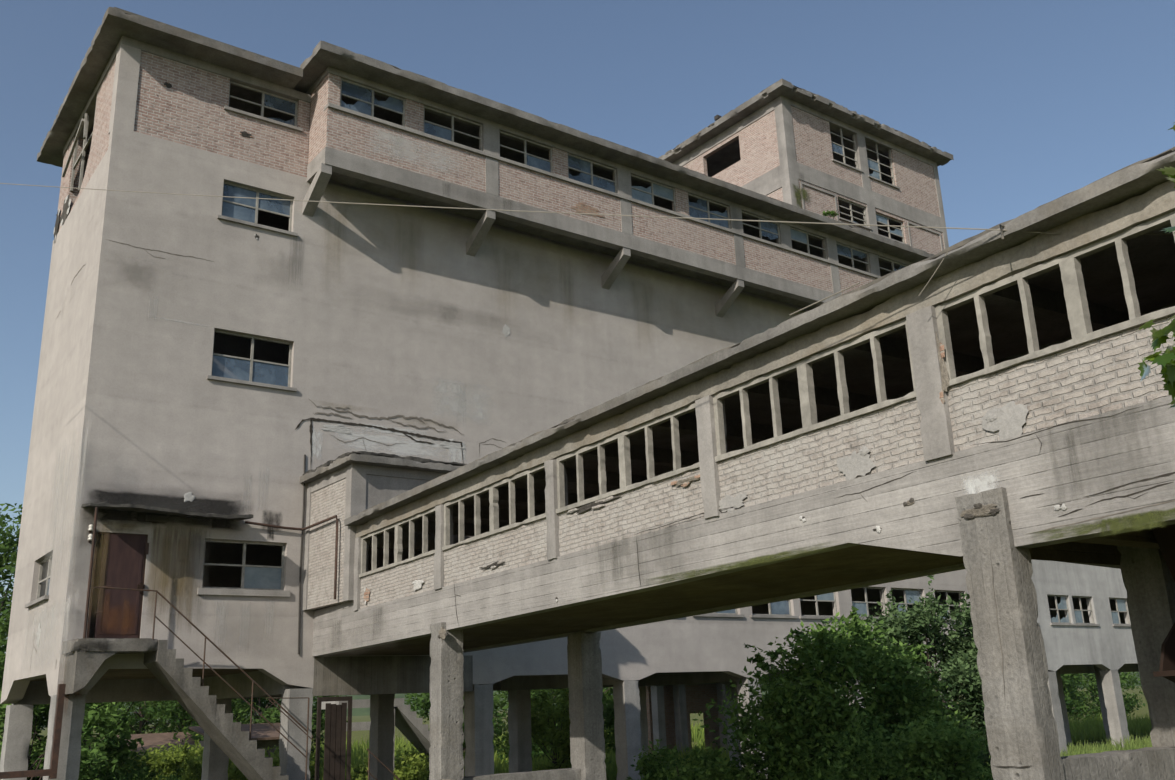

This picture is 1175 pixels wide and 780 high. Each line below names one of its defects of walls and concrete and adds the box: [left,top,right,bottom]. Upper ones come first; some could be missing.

crack [295,399,504,459]
crack [1022,472,1175,534]